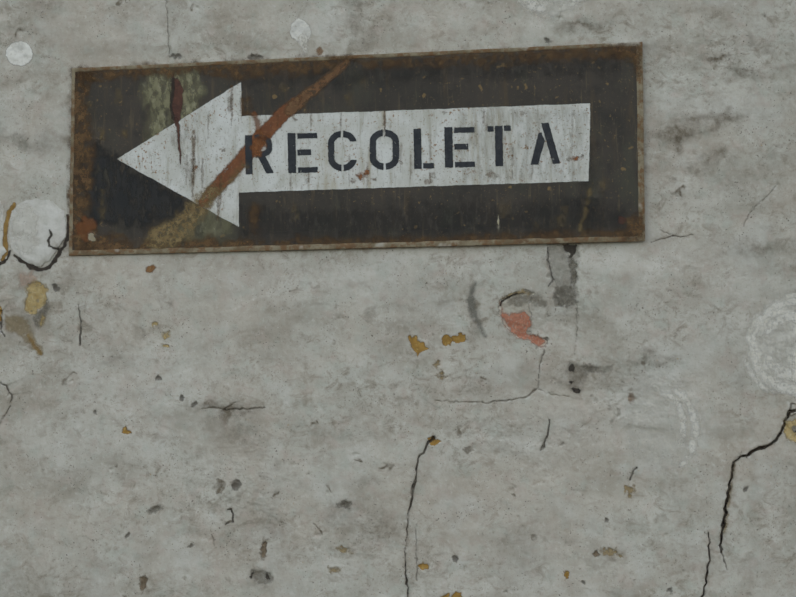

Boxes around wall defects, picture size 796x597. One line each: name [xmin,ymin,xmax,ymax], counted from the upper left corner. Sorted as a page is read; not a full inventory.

flaking render [1,202,16,261]
crack [0,214,69,271]
flaking render [548,244,577,307]
flaking render [0,273,49,354]
peeling [451,332,466,343]
flaking render [498,289,548,347]
leakage [744,293,796,396]
crack [405,436,435,594]
crack [701,409,795,597]